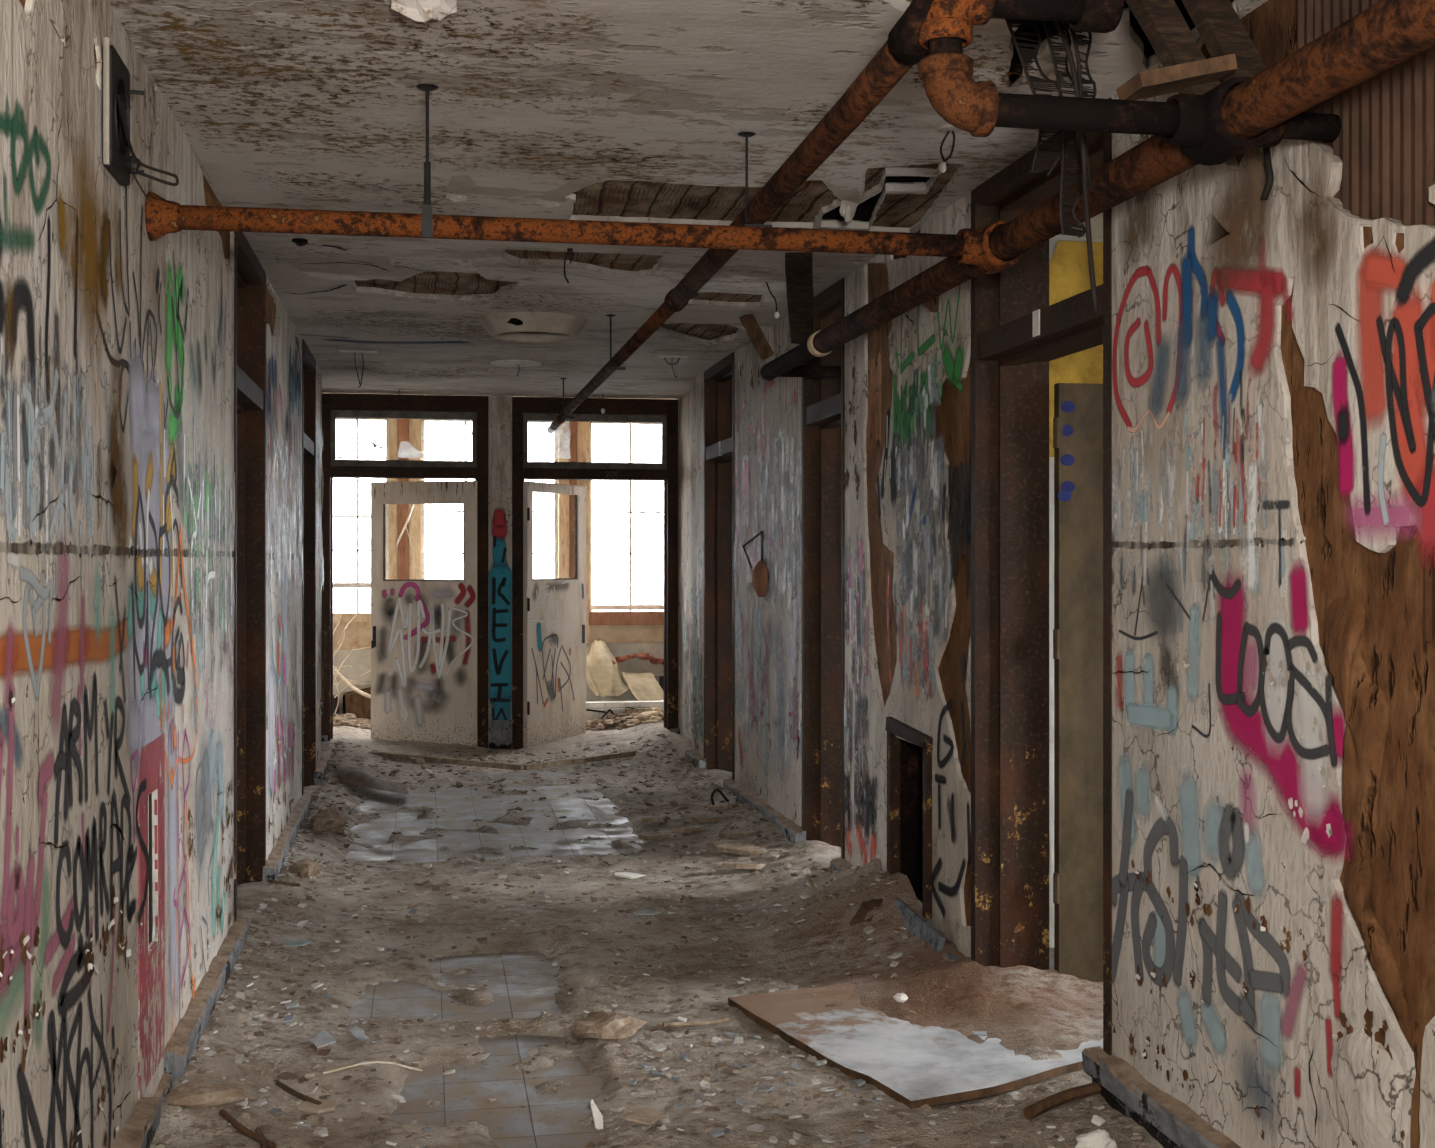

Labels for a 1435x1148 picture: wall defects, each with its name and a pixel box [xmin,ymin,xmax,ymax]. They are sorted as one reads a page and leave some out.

water stain [110,0,694,215]
spalling [1272,276,1435,1148]
peeling [1135,965,1167,994]
peeling [1129,1033,1195,1090]